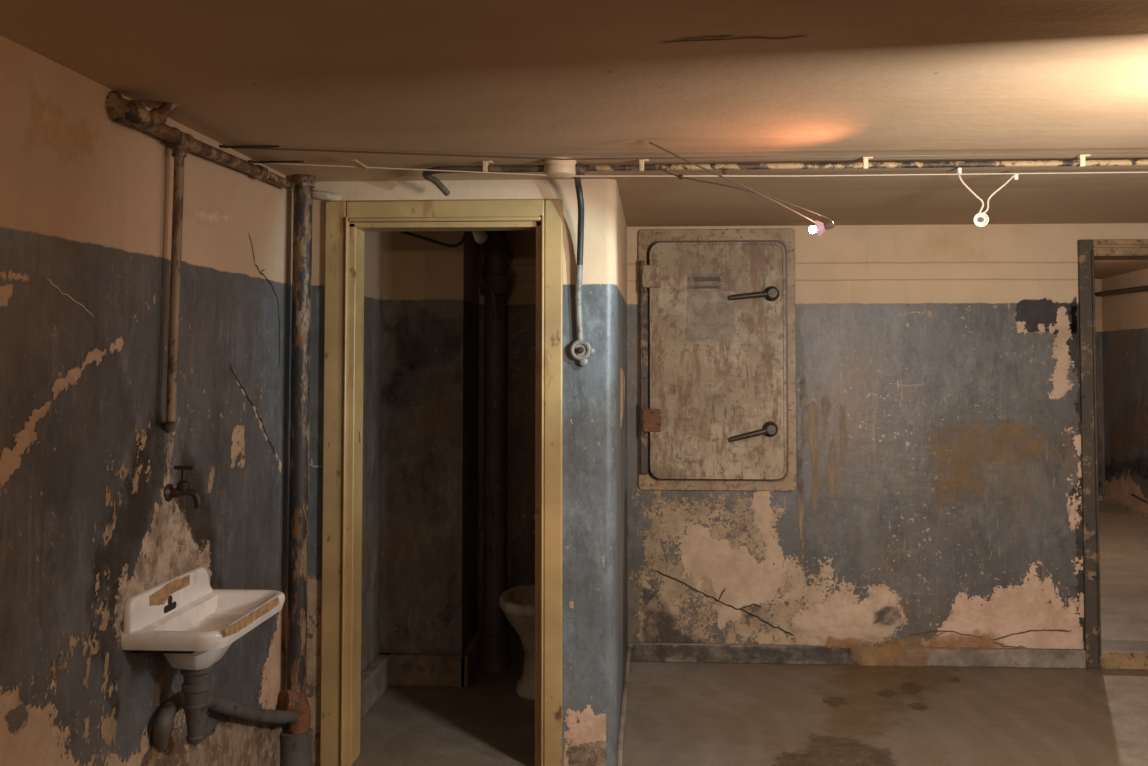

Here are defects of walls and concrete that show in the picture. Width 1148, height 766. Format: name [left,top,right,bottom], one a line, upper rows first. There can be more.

crack [230,365,282,472]
crack [249,234,280,363]
peeling [1016,306,1075,399]
water stain [1015,297,1081,434]
peeling [1062,418,1082,533]
spalling [0,421,288,766]
crack [655,570,794,636]
peeling [629,488,864,645]
peeling [921,561,1084,649]
water stain [1069,477,1084,642]
peeling [563,697,606,766]